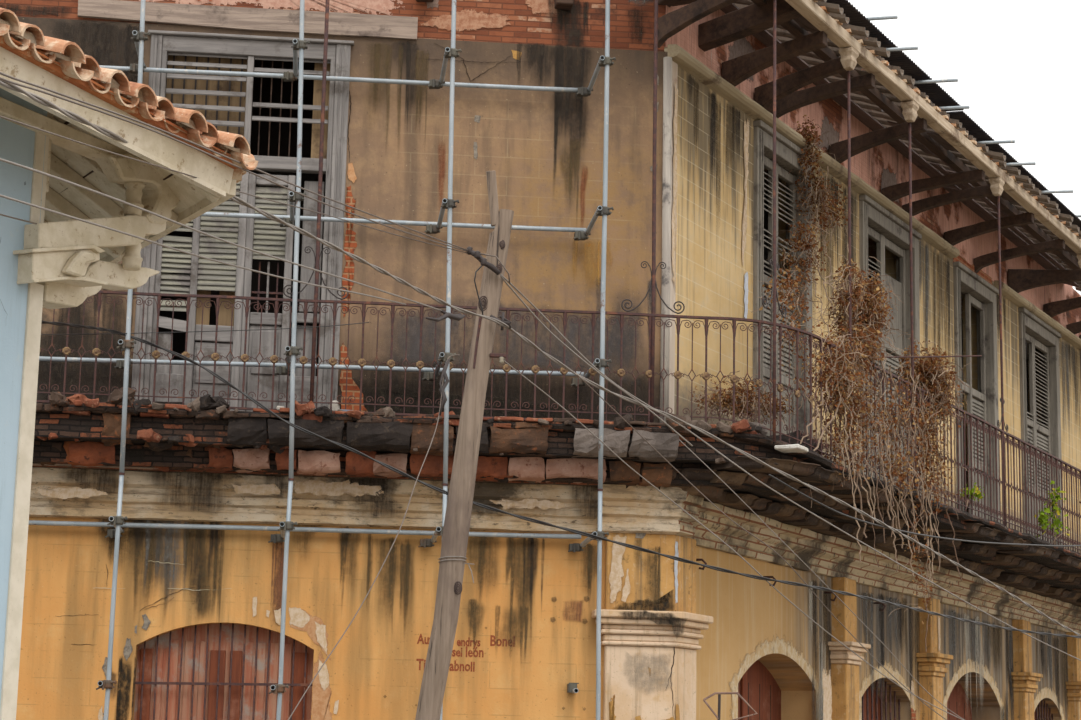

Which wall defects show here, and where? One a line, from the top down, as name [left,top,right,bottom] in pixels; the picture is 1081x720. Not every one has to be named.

peeling [139,0,405,16]
water stain [420,9,510,32]
water stain [517,0,589,199]
spalling [342,163,357,317]
peeling [35,487,108,499]
peeling [294,480,384,497]
water stain [101,518,224,613]
water stain [341,526,412,615]
water stain [496,537,544,650]
peeling [609,533,646,603]
water stain [111,659,136,720]
peeling [252,597,339,720]